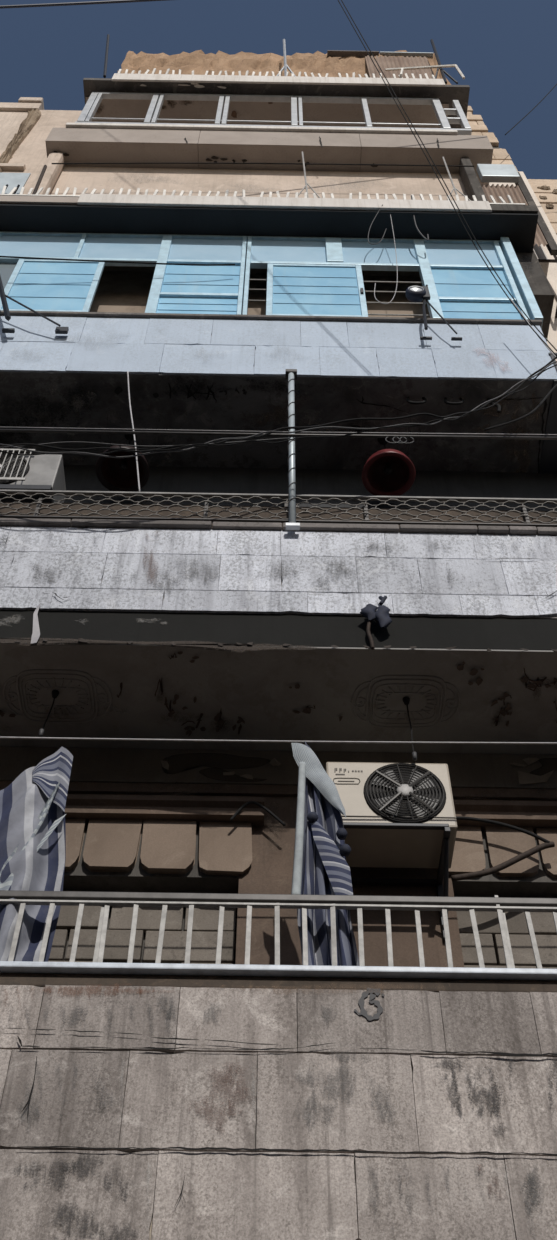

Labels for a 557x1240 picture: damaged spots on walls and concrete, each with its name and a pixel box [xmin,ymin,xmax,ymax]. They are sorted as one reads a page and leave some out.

crack [12,1028,557,1114]
damp [436,1058,512,1133]
damp [16,1153,128,1199]
crack [19,1146,557,1205]
damp [53,1202,136,1240]